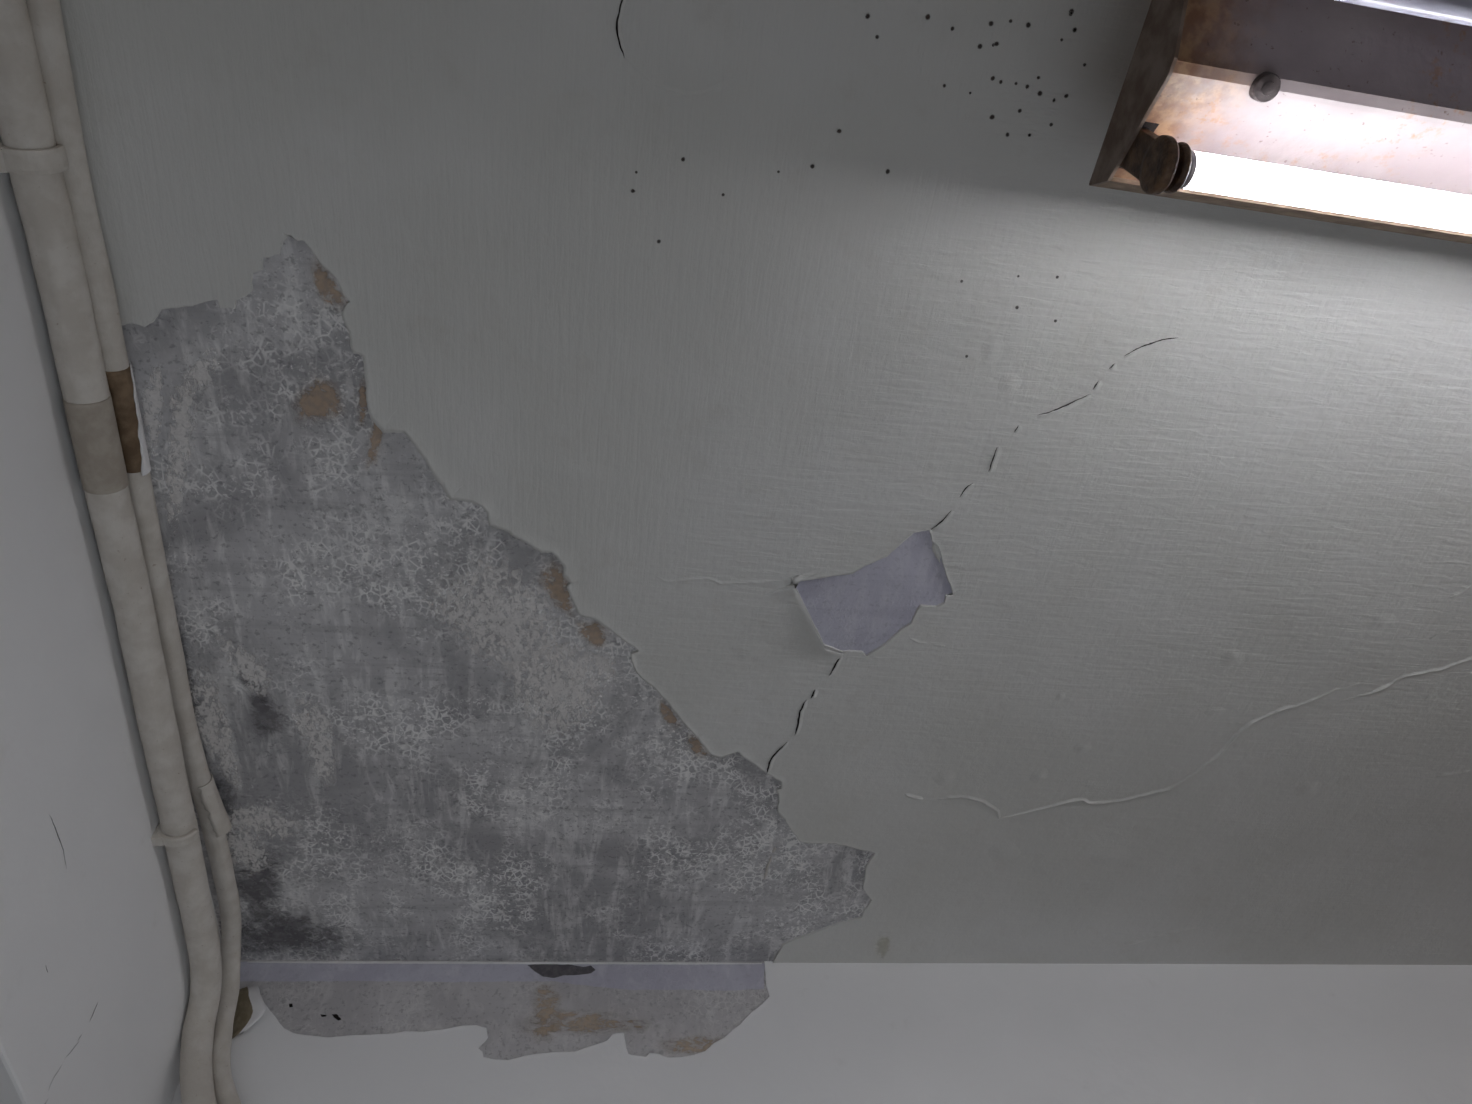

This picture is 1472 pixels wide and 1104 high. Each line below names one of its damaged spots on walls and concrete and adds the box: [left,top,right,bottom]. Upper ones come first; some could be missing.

crack [932,337,1177,531]
peeling [120,229,880,1066]
crack [767,655,843,772]
peeling [764,527,960,672]
crack [905,656,1472,822]